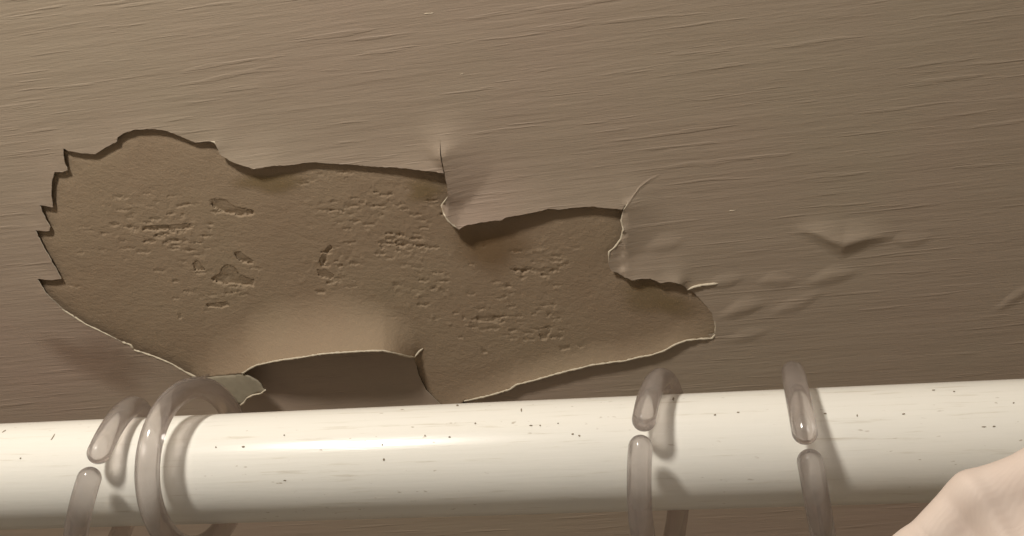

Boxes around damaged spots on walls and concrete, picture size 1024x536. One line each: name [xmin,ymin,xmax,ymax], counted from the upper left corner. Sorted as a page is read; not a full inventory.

peeling [175,399,214,416]
peeling [0,64,776,410]